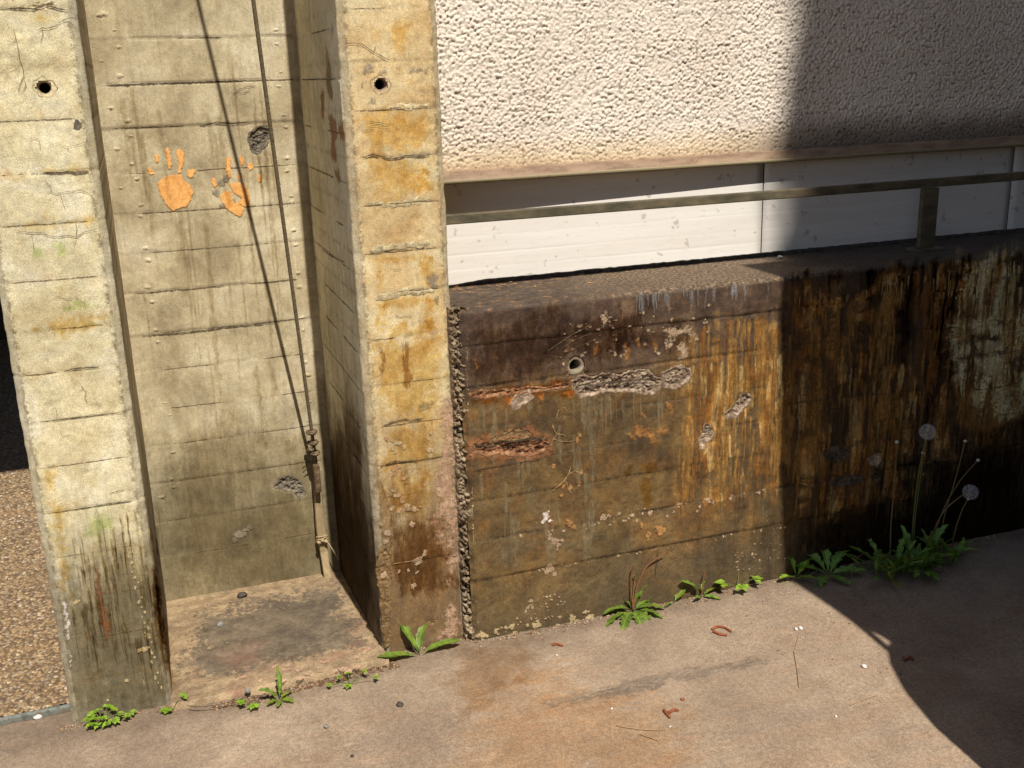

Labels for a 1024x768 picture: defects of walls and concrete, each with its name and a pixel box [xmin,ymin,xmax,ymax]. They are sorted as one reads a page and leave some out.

spalling [247,125,270,155]
corrosion [402,342,413,386]
leakage [837,249,1024,453]
corrosion [629,413,668,443]
spalling [724,393,753,420]
spalling [272,273,715,683]